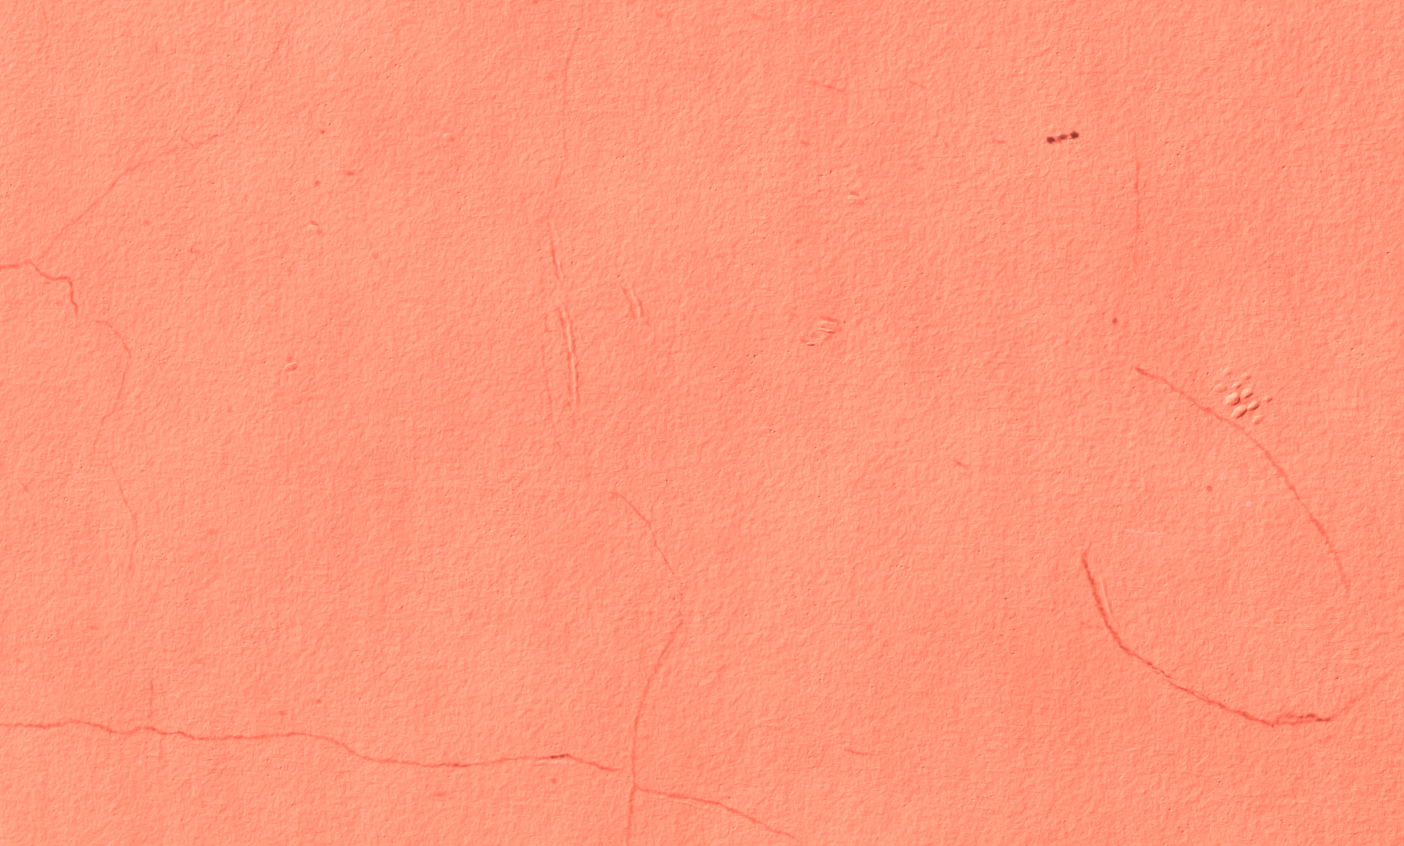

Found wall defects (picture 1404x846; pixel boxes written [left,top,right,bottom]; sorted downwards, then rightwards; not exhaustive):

crack [1088,572,1314,726]